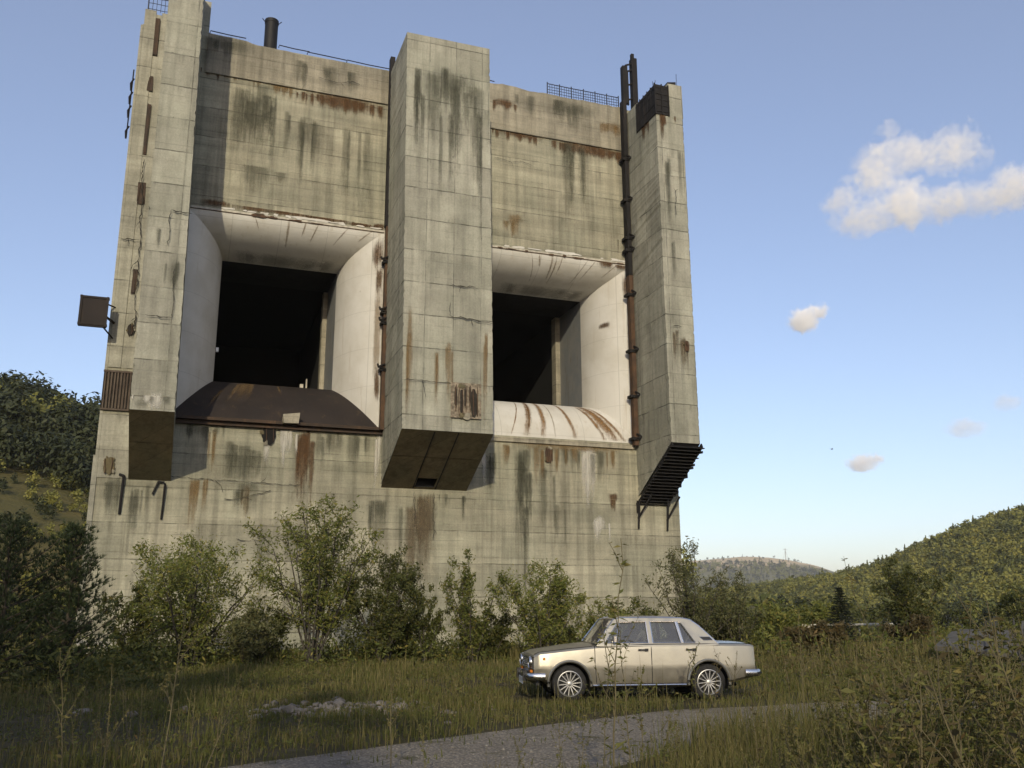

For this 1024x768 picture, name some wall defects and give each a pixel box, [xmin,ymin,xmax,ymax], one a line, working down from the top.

corrosion [297,92,383,115]
corrosion [492,129,537,144]
corrosion [552,141,621,161]
crack [121,160,175,335]
corrosion [373,243,383,288]
corrosion [513,402,545,432]
corrosion [580,407,619,438]
corrosion [296,432,315,488]
water stain [407,496,433,565]